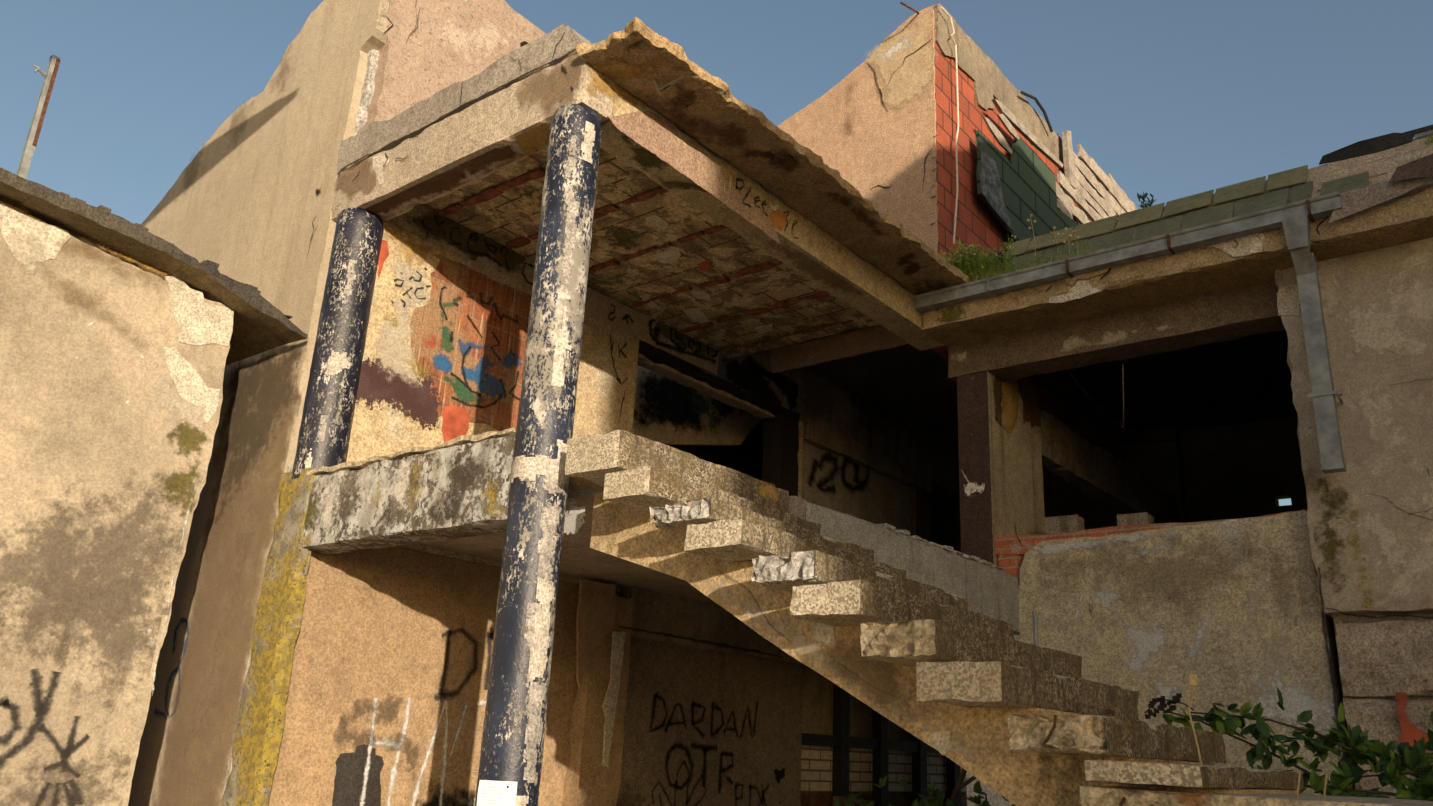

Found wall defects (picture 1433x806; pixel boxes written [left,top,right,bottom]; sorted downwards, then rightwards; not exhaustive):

water stain [622,135,732,198]
water stain [589,40,799,172]
crack [867,39,932,112]
peeling [0,203,71,273]
water stain [774,245,857,294]
peeling [153,276,234,428]
spalling [326,240,532,443]
water stain [159,348,300,806]
peeling [510,439,585,806]